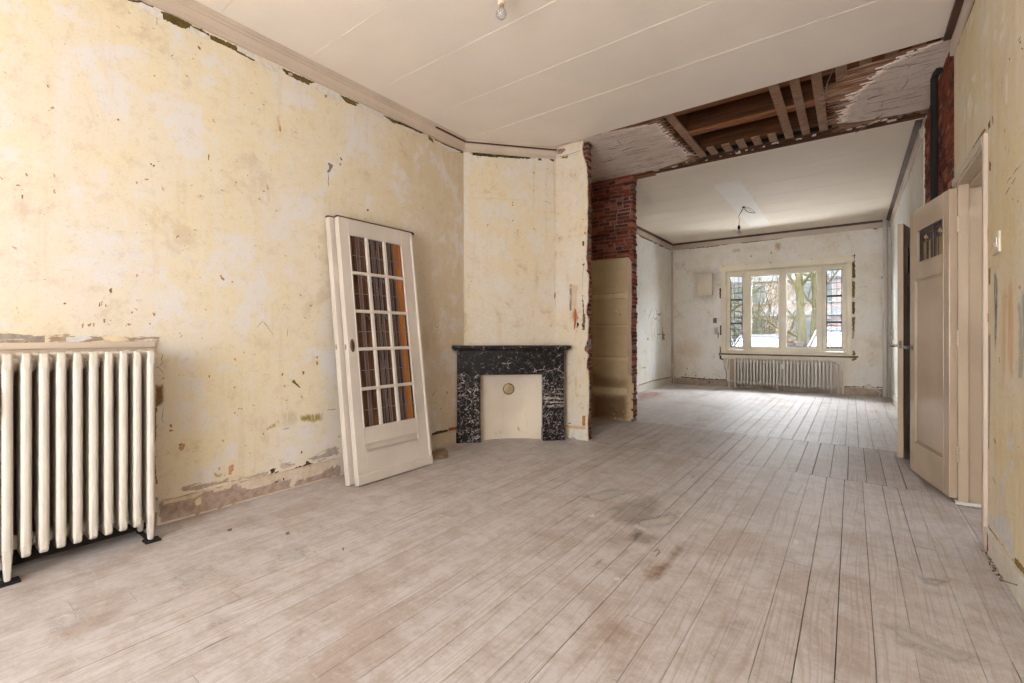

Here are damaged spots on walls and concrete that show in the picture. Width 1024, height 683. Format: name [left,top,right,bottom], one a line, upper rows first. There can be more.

spalling [127,0,464,154]
peeling [0,287,165,347]
spalling [155,409,343,526]